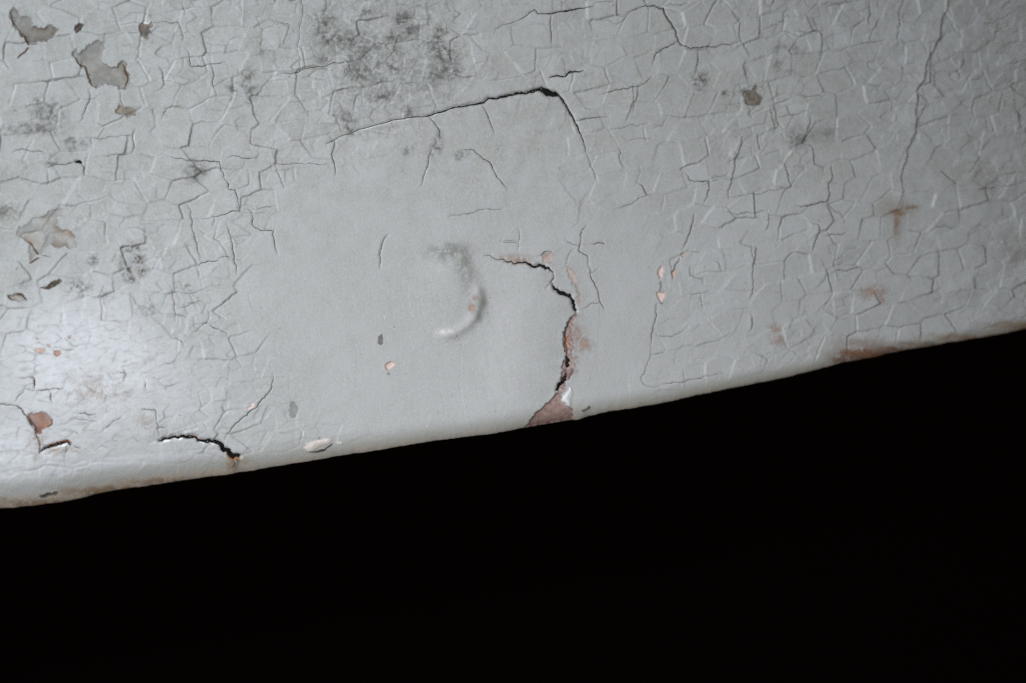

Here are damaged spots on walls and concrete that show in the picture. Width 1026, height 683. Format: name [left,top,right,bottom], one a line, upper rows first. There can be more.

peeling [10,8,58,59]
peeling [72,40,130,90]
leakage [433,29,458,78]
crack [173,0,748,274]
peeling [17,208,77,263]
crack [485,227,604,391]
peeling [525,266,591,427]
crack [641,313,721,387]
peeling [28,412,53,434]
crack [0,378,120,452]
crack [145,378,274,464]
peeling [301,428,342,453]